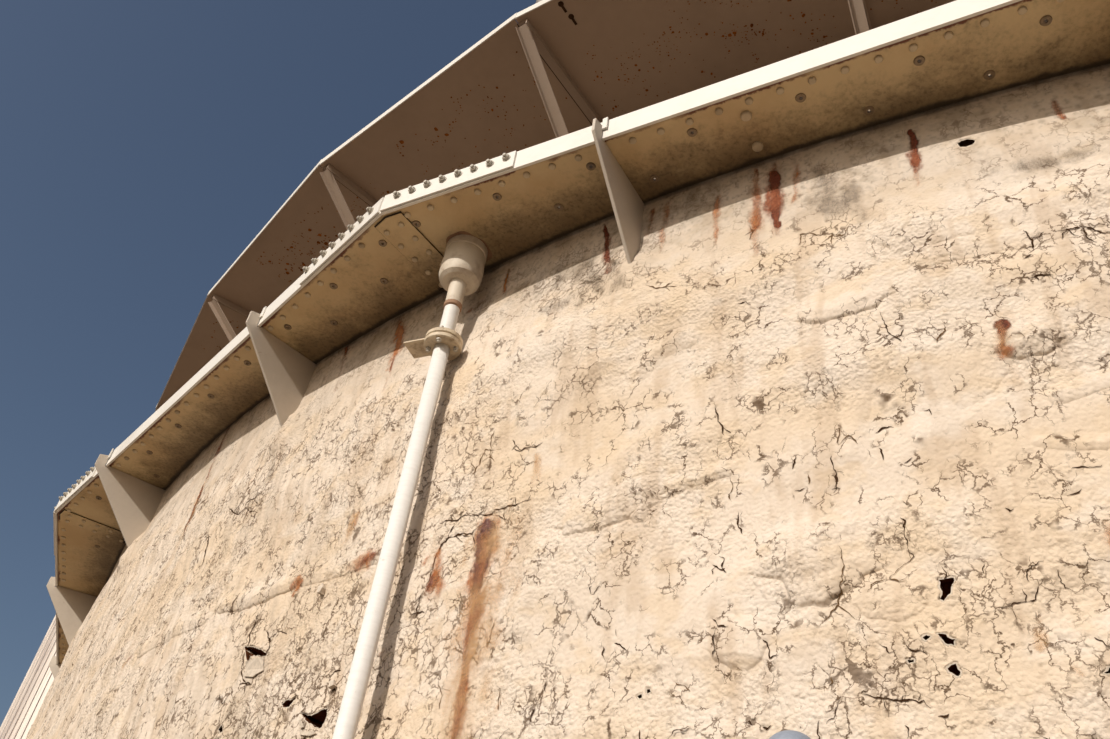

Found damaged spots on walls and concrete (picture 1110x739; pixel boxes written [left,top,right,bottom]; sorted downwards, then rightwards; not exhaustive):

corrosion [906,129,921,171]
corrosion [751,164,799,231]
corrosion [603,224,611,262]
corrosion [390,323,404,370]
corrosion [993,319,1013,357]
crack [792,426,911,492]
crack [728,480,742,533]
crack [825,518,914,621]
crack [1001,561,1073,619]
corrosion [451,519,498,739]
peeling [244,657,264,677]